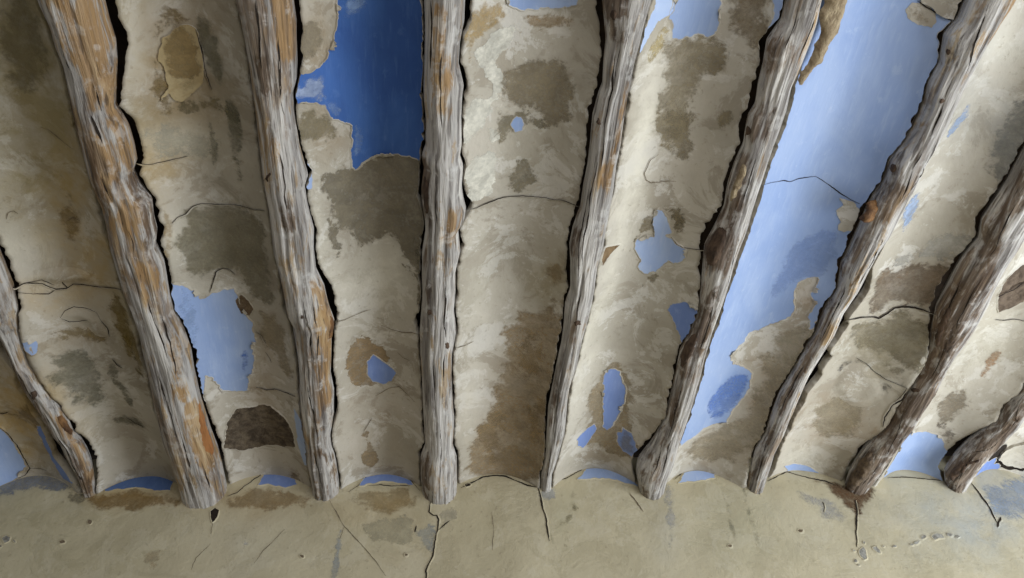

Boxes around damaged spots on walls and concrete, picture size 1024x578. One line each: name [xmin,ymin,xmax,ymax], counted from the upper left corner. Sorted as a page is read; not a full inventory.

peeling [296,0,424,171]
damp [463,6,574,201]
damp [648,29,726,159]
damp [321,155,423,304]
crack [765,176,859,204]
peeling [680,0,953,447]
peeling [171,282,307,466]
crack [333,470,581,578]
damp [466,299,562,480]
crack [768,471,939,547]
peeling [883,430,948,481]
crack [972,484,1003,528]